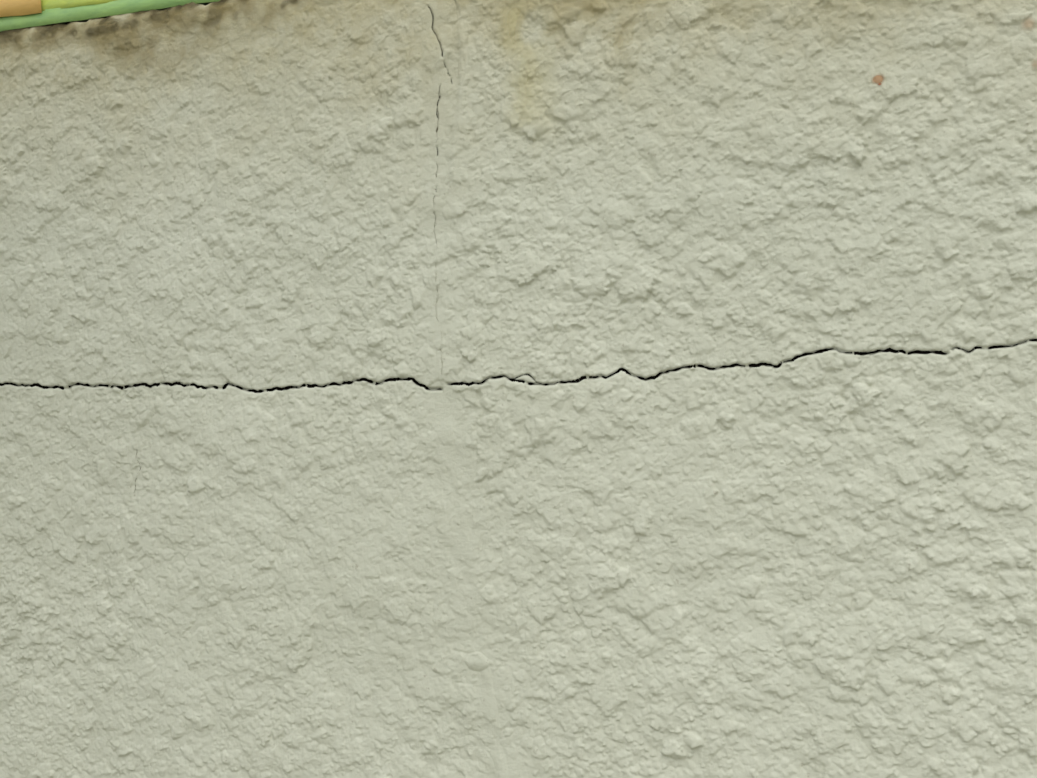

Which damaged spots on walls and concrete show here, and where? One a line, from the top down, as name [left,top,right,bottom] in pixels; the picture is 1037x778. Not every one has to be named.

crack [0,339,1037,393]